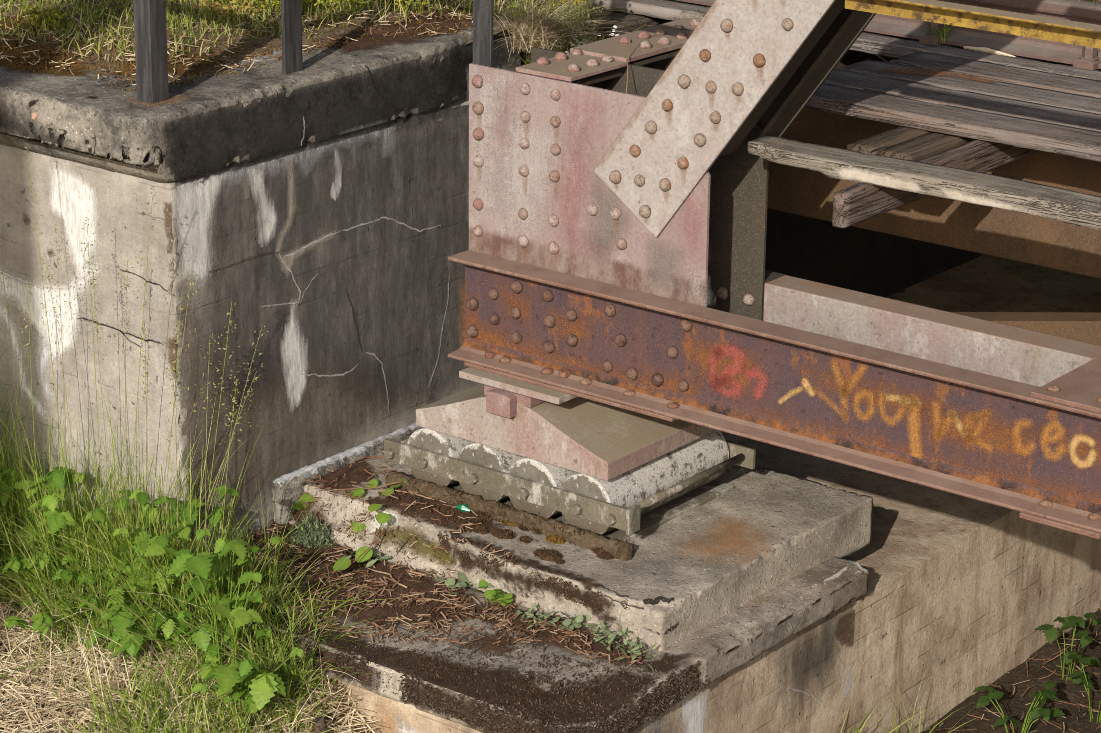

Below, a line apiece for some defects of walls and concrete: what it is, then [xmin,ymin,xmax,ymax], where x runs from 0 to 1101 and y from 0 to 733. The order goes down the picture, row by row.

crack [78,317,164,347]
leakage [175,118,469,511]
crack [212,217,441,307]
crack [303,290,389,412]